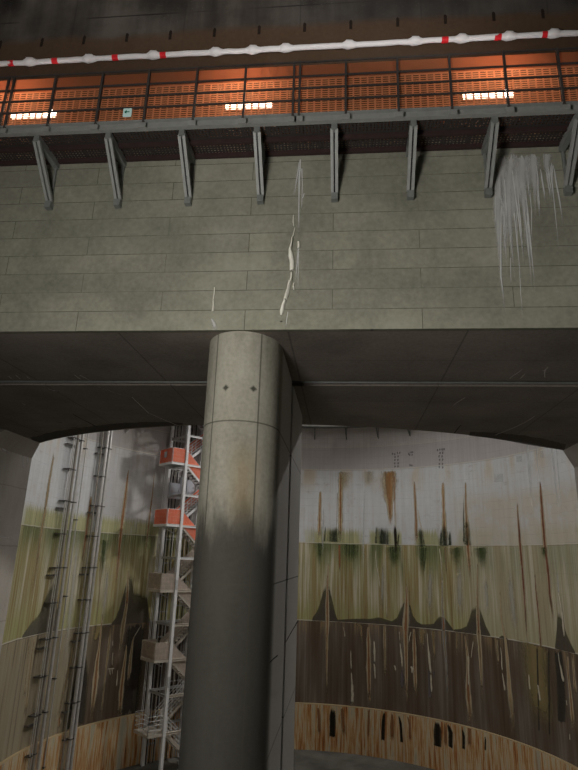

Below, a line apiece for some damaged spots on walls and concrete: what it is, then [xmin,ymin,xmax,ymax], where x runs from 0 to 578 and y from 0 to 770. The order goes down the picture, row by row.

efflorescence [494,154,562,303]
corrosion [91,470,135,708]
corrosion [382,471,396,520]
leakage [312,529,507,698]
corrosion [456,484,483,712]
corrosion [517,505,542,647]
corrosion [539,483,552,605]
leakage [528,587,575,734]